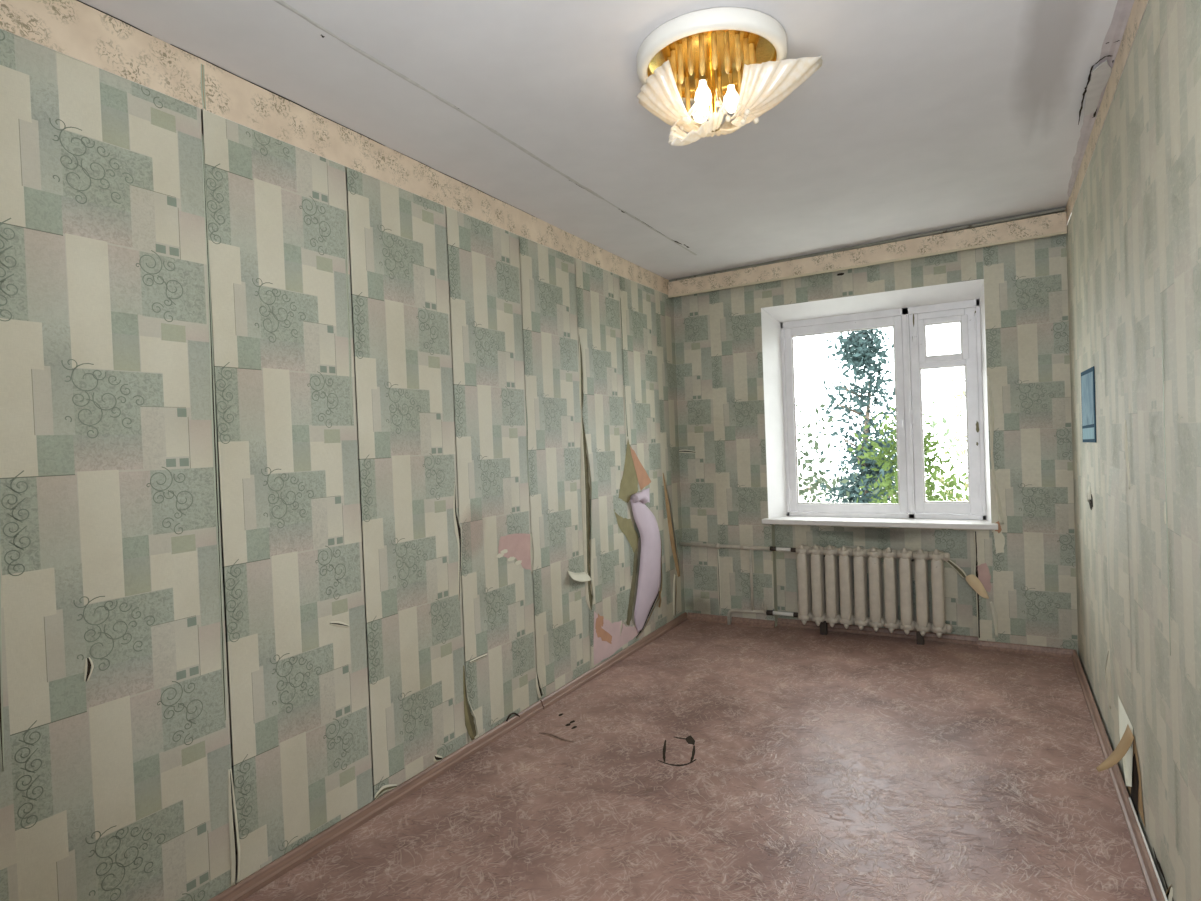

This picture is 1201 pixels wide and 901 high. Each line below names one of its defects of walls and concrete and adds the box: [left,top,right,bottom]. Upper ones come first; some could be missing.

flaking render [630,447,651,490]